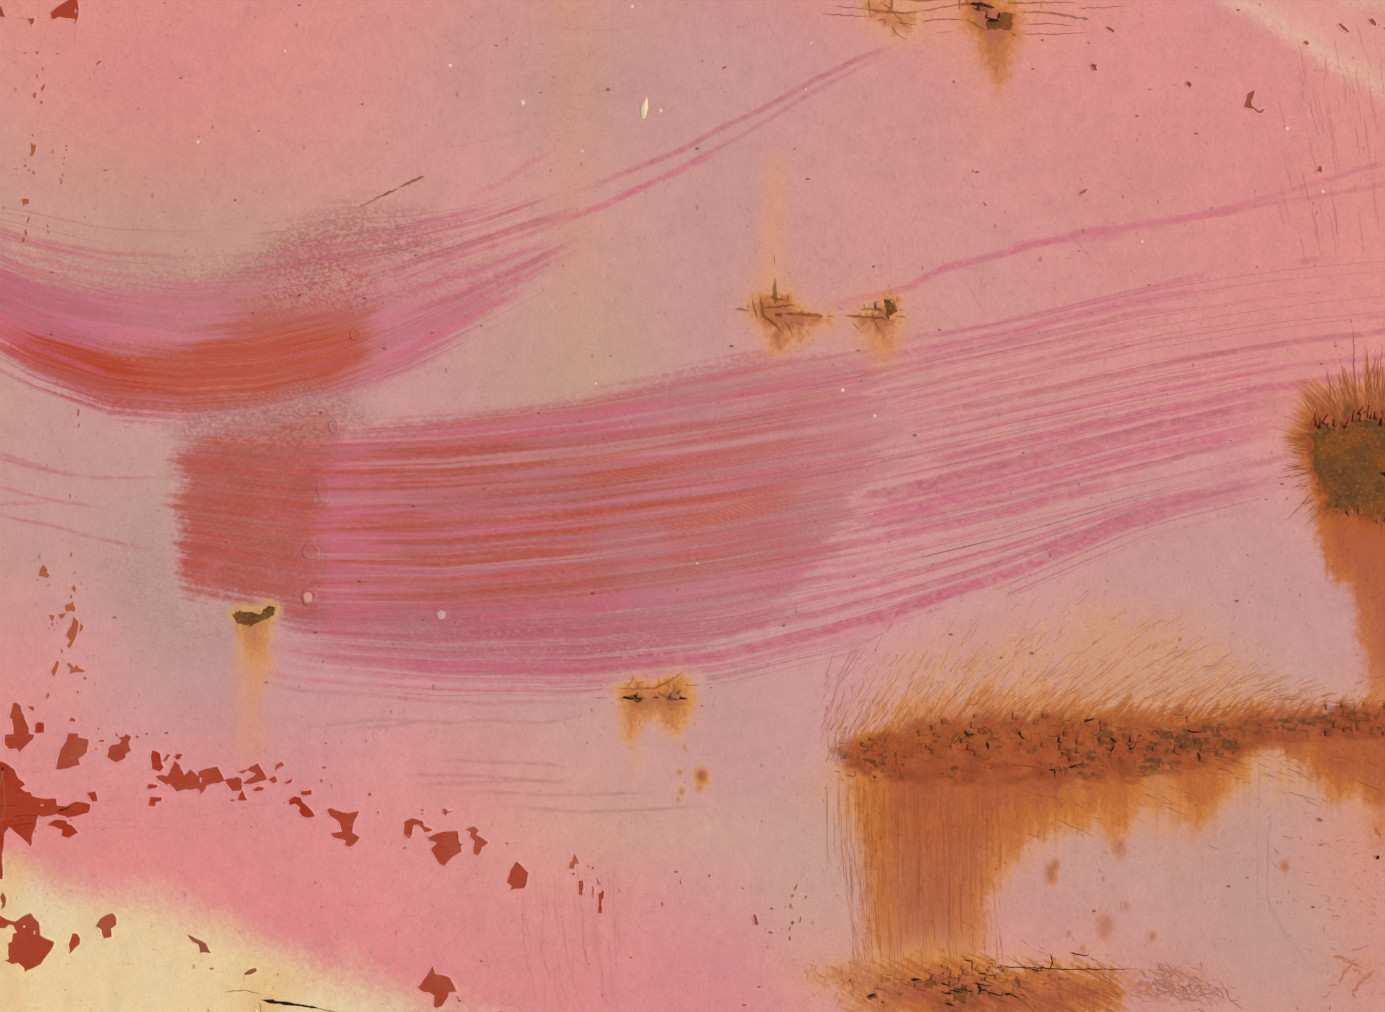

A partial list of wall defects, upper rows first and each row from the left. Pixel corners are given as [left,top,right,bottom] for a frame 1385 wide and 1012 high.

peeling [27,0,80,27]
rust [801,0,1179,106]
rust [715,255,934,386]
peeling [0,551,118,974]
peeling [54,716,380,849]
rust [216,595,291,778]
rust [594,658,715,807]
rust [760,318,1385,1012]
peeling [186,933,213,955]
peeling [415,965,462,1011]
peeling [402,807,530,892]
peeling [568,853,621,914]